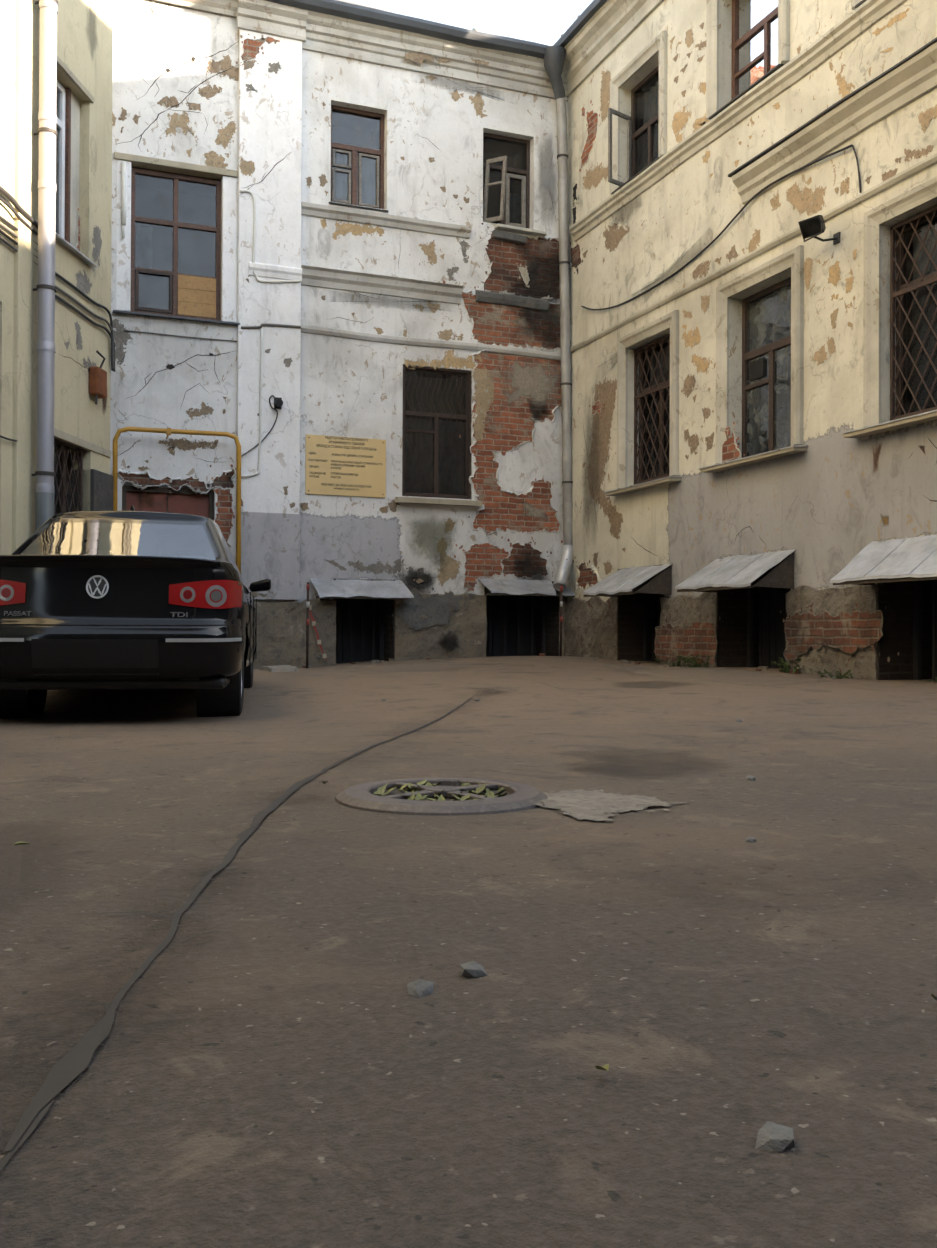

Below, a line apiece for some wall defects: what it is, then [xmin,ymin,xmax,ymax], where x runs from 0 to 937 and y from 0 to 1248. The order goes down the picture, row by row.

crack [118,0,237,147]
spalling [157,33,281,176]
peeling [449,90,488,118]
spalling [572,68,611,224]
peeling [865,104,937,184]
spalling [603,223,630,263]
spalling [770,177,850,220]
spalling [117,460,243,549]
peeling [159,437,218,456]
flaking render [324,223,588,640]
spalling [587,377,626,552]
spalling [573,553,613,597]